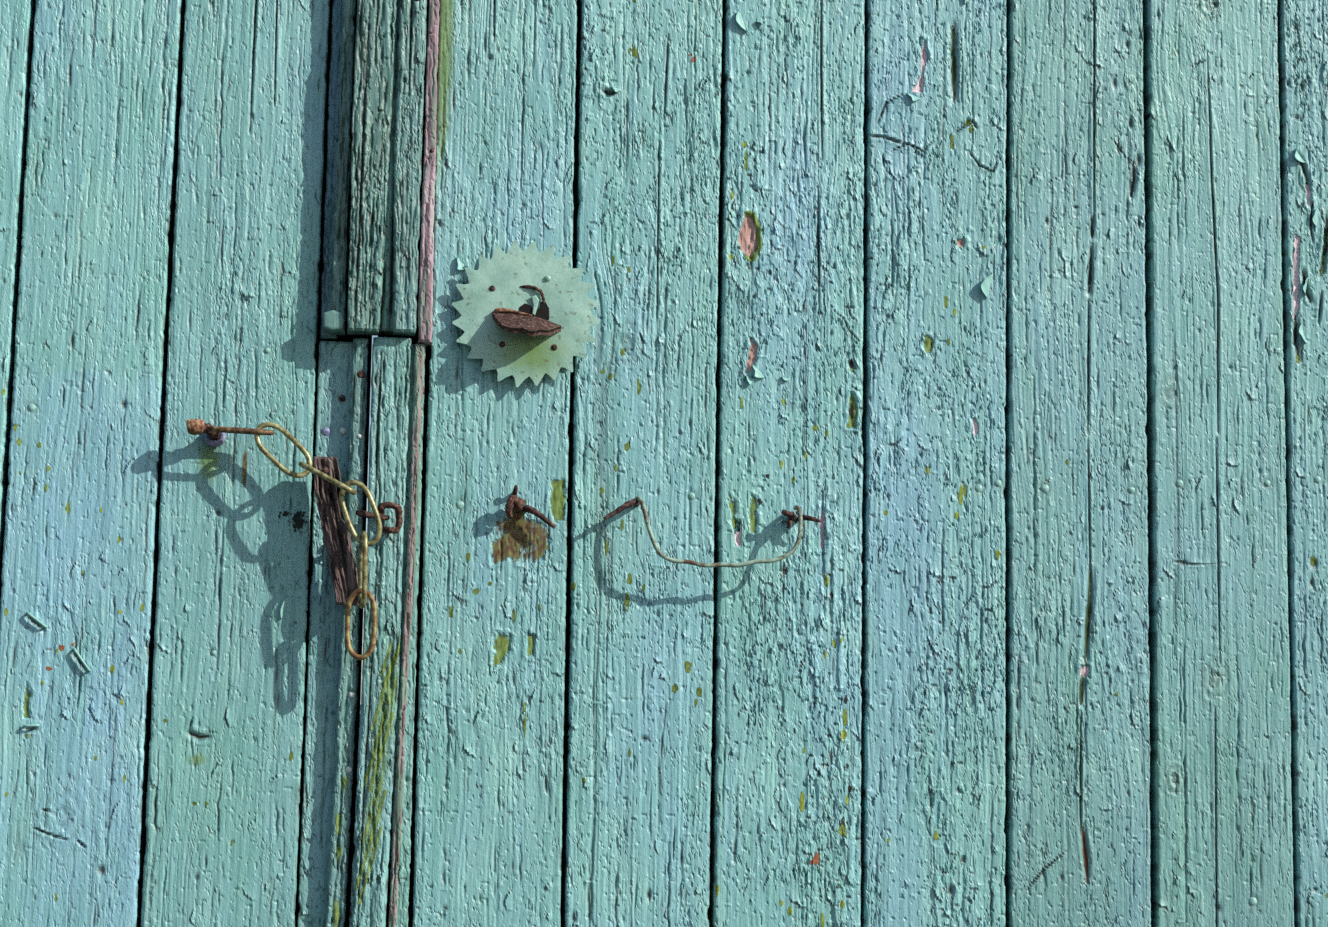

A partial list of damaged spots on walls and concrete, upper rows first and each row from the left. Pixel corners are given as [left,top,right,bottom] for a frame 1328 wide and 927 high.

peeling [907,40,927,101]
peeling [729,211,762,262]
corrosion [520,285,545,304]
peeling [1293,184,1326,363]
peeling [740,339,764,409]
crack [1027,1,1096,890]
corrosion [492,499,549,563]
peeling [831,695,848,765]
peeling [838,785,852,837]